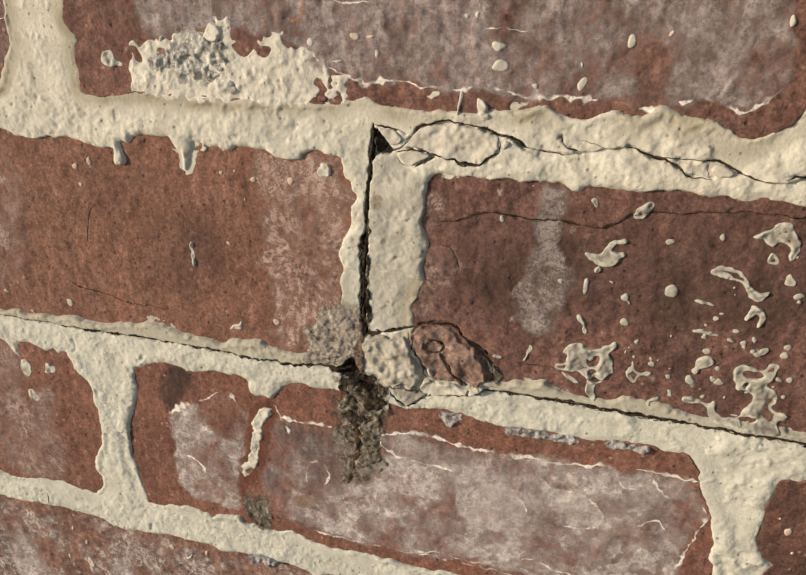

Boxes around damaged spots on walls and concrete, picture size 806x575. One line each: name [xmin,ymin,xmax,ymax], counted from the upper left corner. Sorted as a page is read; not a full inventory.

peeling [129,16,349,109]
crack [0,119,806,448]
spalling [303,301,488,405]
efflorescence [165,392,221,498]
efflorescence [214,493,240,508]
efflorescence [221,439,247,476]
damp [264,408,708,575]